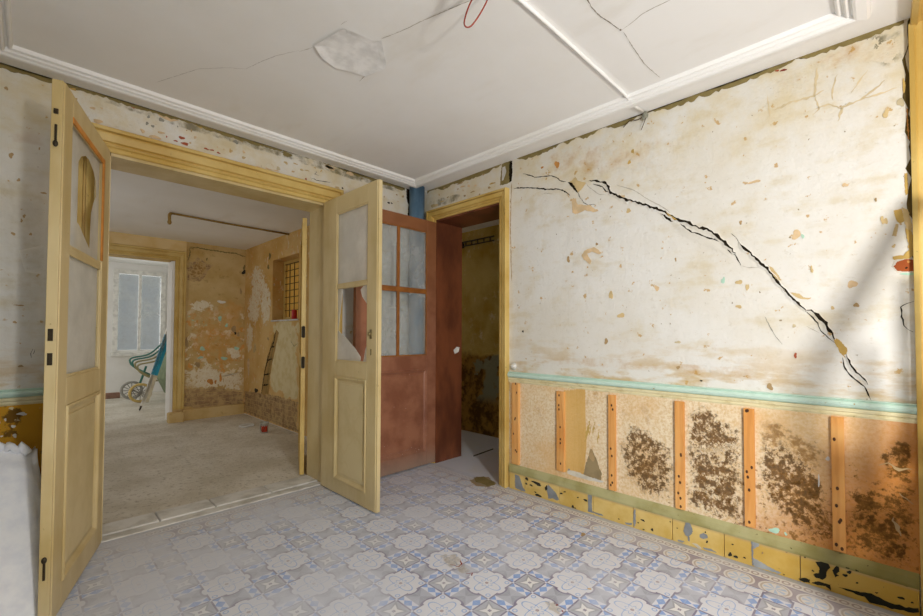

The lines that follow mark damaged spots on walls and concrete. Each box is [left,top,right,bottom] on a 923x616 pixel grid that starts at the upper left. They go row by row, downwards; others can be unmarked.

crack [382,0,471,39]
crack [587,0,667,77]
crack [514,174,570,195]
peeling [880,207,914,275]
crack [589,179,870,398]
peeling [184,253,300,431]
flaking render [567,449,603,483]
water stain [619,424,675,505]
water stain [686,405,744,520]
water stain [757,420,833,540]
water stain [848,440,916,569]
peeling [799,562,919,613]